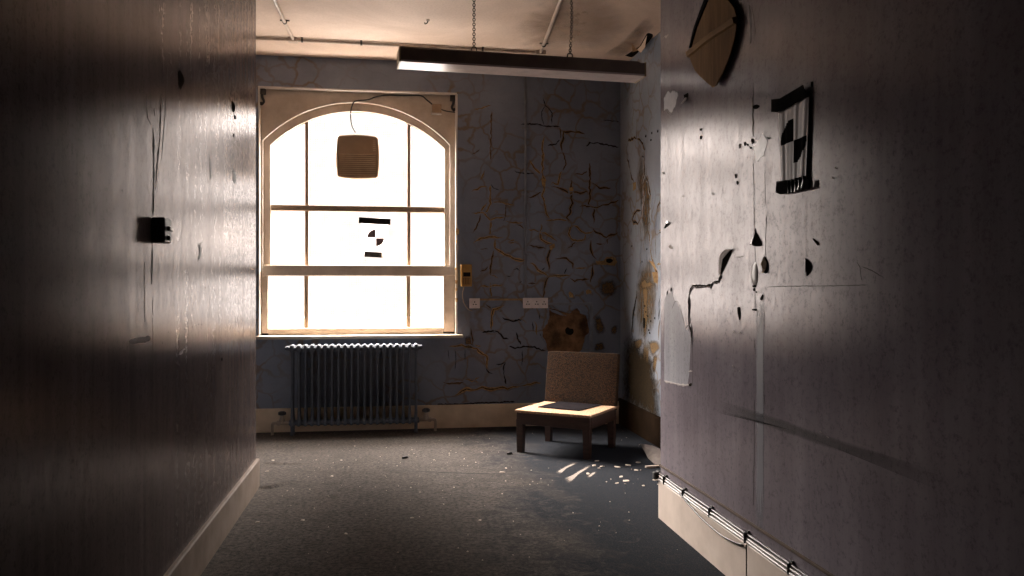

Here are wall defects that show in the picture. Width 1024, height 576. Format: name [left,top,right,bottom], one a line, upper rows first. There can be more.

crack [437,99,661,405]
spalling [540,306,590,354]
peeling [644,287,692,388]